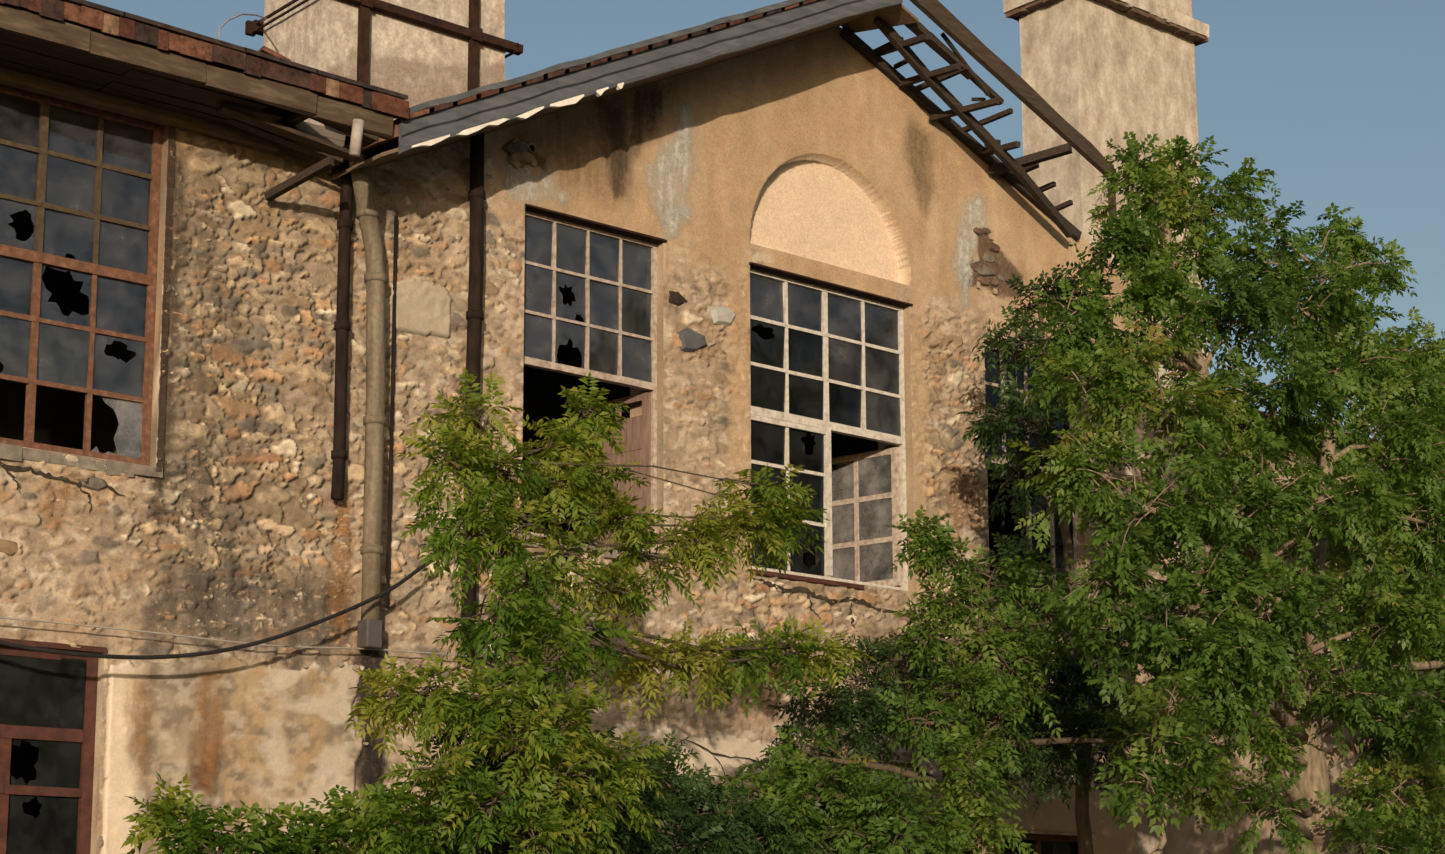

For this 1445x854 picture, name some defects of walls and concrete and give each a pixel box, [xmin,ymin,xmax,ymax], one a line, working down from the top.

leakage [505,83,662,201]
leakage [647,104,691,236]
flaking render [964,227,1025,296]
crack [0,461,125,513]